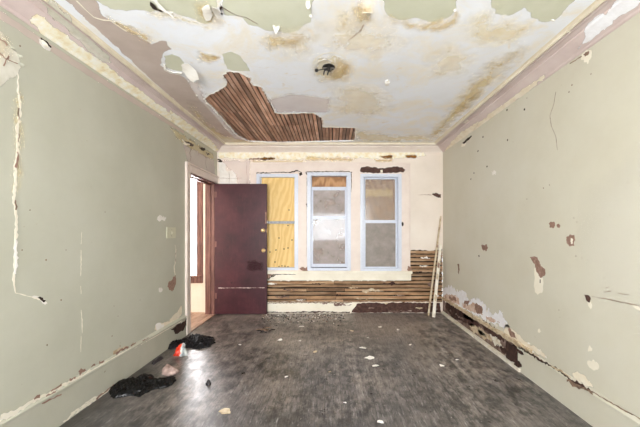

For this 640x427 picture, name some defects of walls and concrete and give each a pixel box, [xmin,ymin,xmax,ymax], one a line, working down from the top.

peeling [384,0,456,22]
peeling [491,0,574,22]
peeling [570,0,640,64]
peeling [30,0,426,184]
peeling [159,247,177,292]
peeling [530,256,546,295]
peeling [154,306,187,334]
spalling [267,302,351,313]
peeling [431,285,547,368]
peeling [572,371,593,387]
spalling [63,382,117,422]